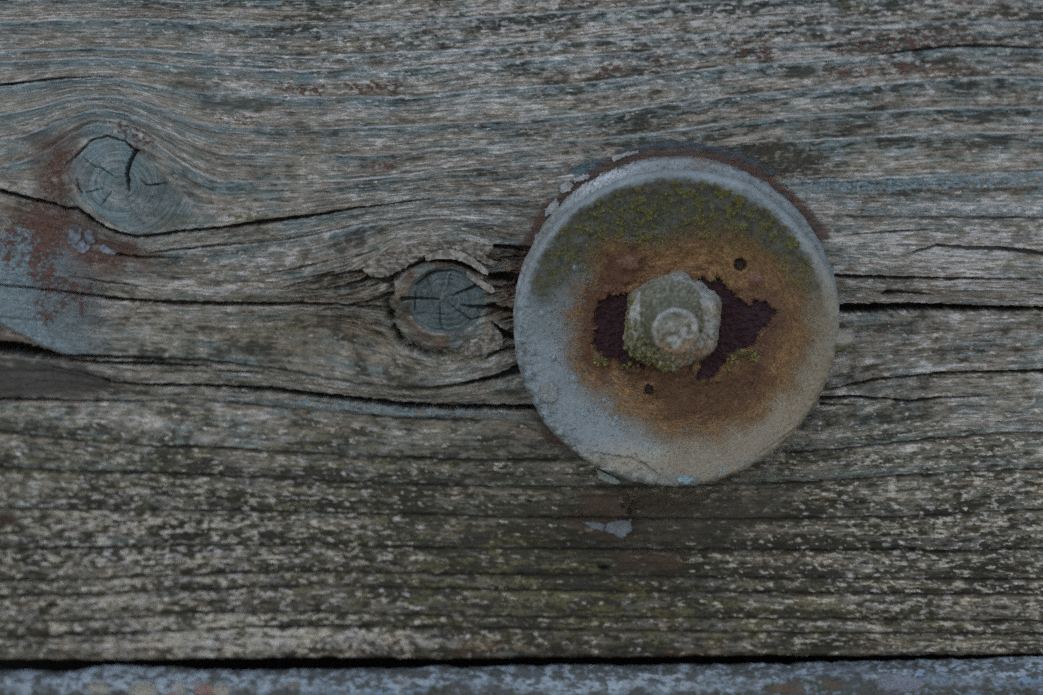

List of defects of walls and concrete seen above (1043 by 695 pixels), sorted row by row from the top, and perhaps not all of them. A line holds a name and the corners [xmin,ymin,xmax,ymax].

peeling [67,225,116,255]
crack [0,134,538,413]
rust [506,147,830,298]
rust [566,234,807,439]
crack [818,368,1043,407]
crack [833,227,1043,315]